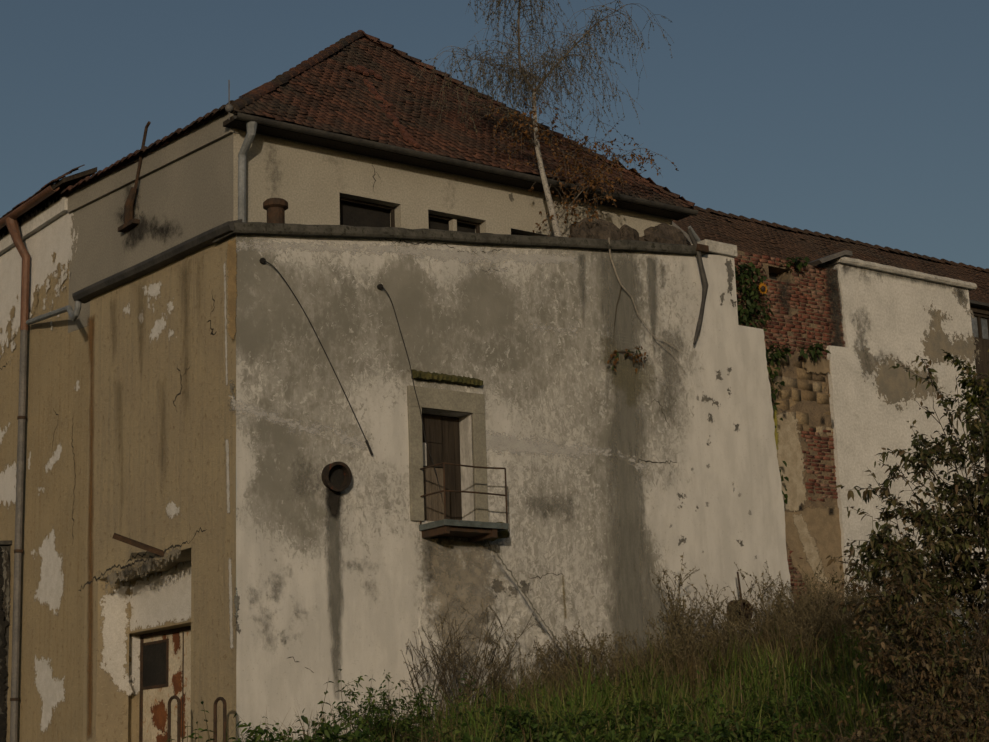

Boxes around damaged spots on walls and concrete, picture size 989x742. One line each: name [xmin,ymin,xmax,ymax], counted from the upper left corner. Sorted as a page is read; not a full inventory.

peeling [0,212,79,359]
peeling [123,281,177,343]
flaking render [855,303,981,411]
peeling [0,451,31,510]
leakage [601,256,664,663]
peeling [31,526,65,616]
flaking render [98,544,191,696]
rust [162,632,180,655]
leakage [326,488,343,687]
peeling [34,654,66,733]
rust [150,700,168,742]
rust [168,666,186,738]